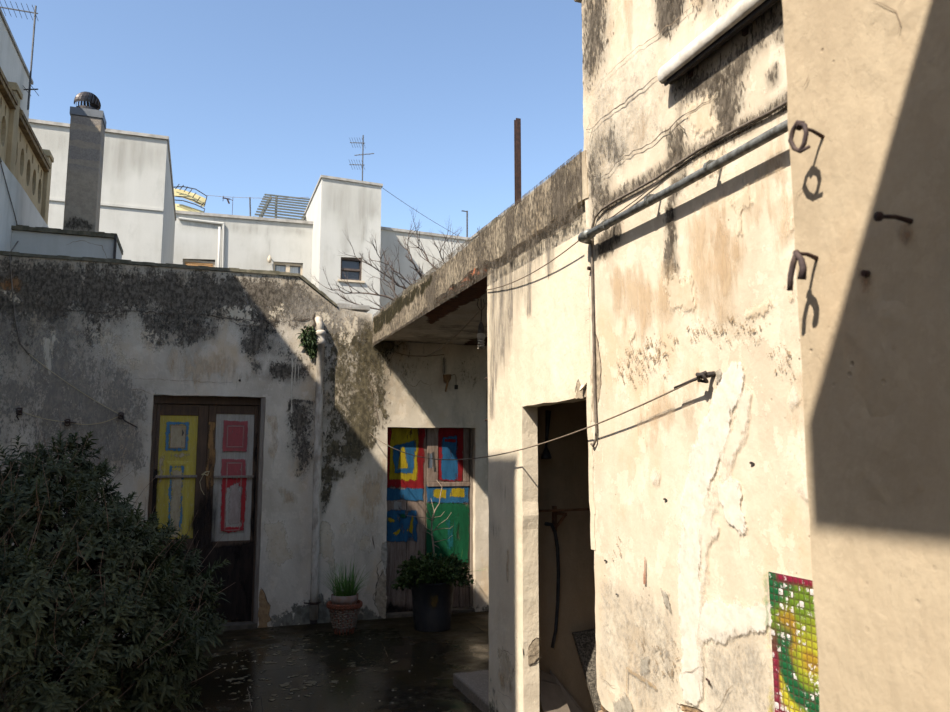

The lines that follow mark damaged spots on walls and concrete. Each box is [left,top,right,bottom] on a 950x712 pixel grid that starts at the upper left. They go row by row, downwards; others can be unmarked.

crack [586,76,657,142]
crack [589,94,717,179]
water stain [0,0,787,513]
flaking render [677,703,703,712]